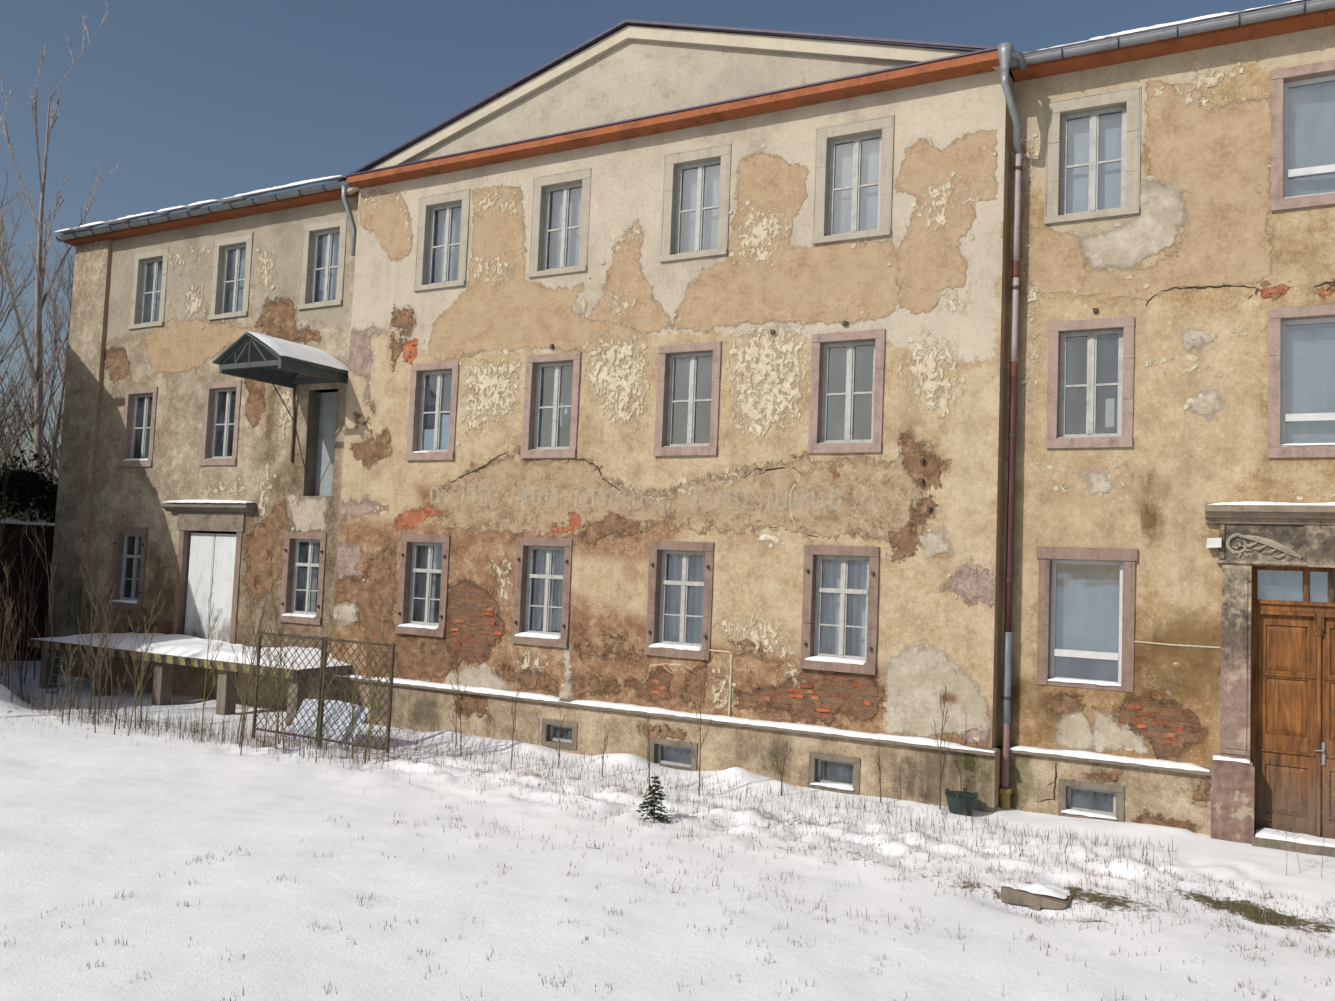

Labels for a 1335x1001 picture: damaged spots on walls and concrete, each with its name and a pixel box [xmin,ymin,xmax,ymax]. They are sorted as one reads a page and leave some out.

flaking render [348,130,1039,469]
crack [1146,285,1259,305]
crack [443,451,508,493]
crack [566,459,621,491]
crack [742,465,818,542]
flaking render [334,431,950,727]
peeling [940,559,995,608]
flaking render [1040,691,1096,721]
flaking render [1112,662,1207,763]